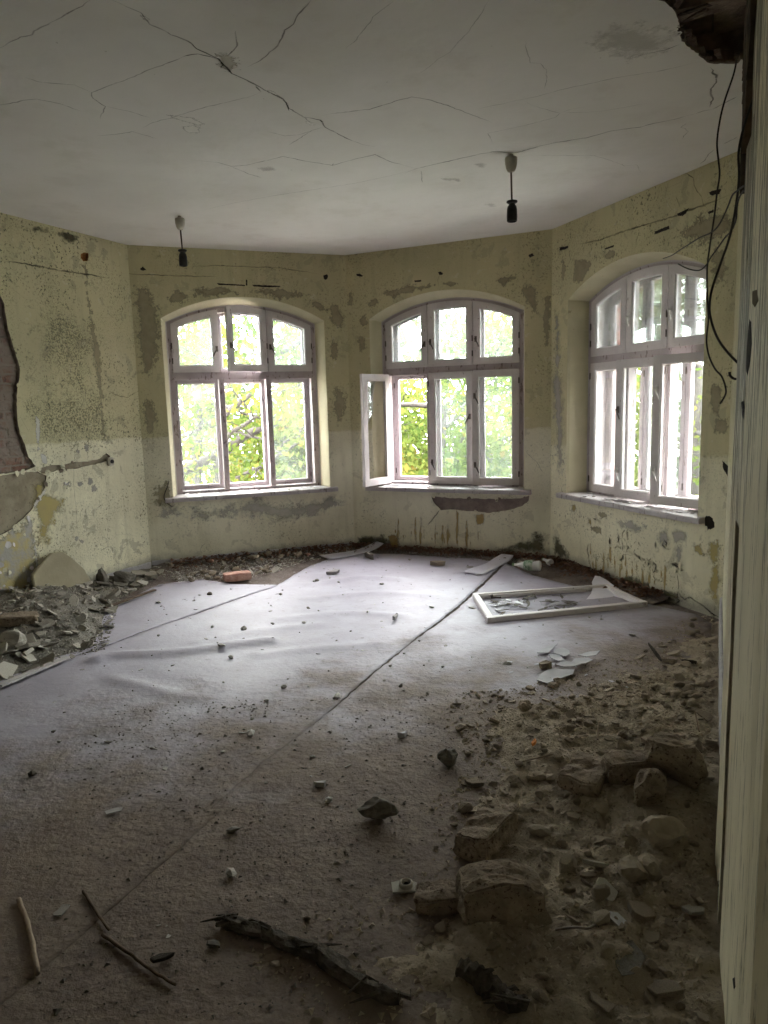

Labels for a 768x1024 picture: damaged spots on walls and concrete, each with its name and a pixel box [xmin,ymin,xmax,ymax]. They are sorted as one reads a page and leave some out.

crack [168,7,393,177]
flaking render [0,296,97,595]
leakage [26,315,106,449]
leakage [132,285,238,373]
flaking render [387,483,529,513]
leakage [695,539,719,603]